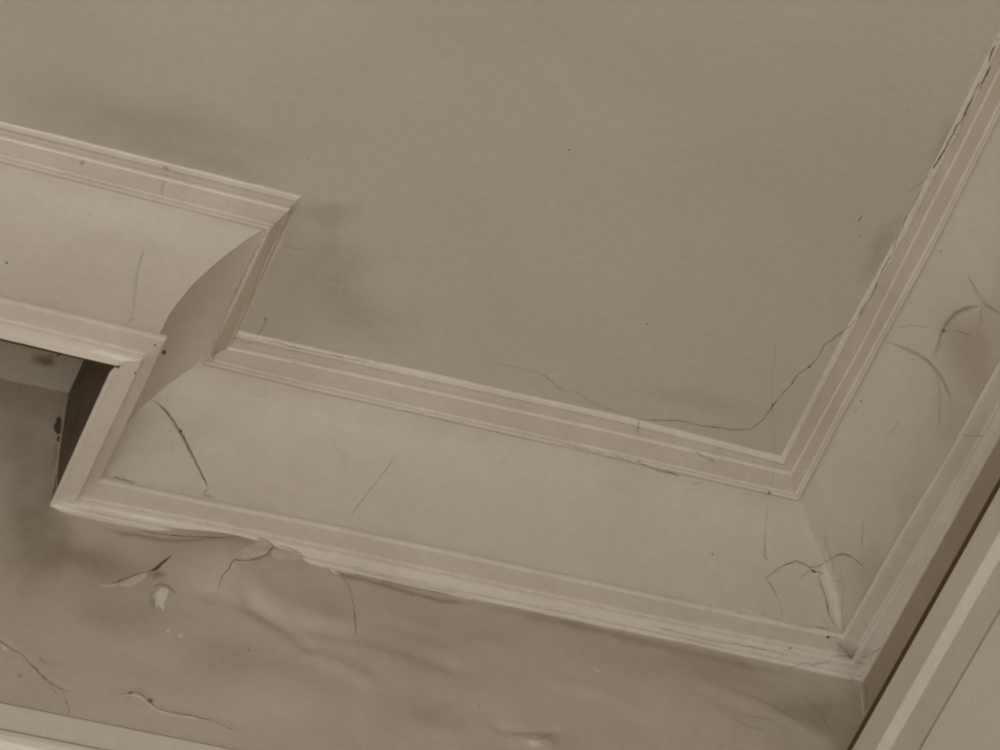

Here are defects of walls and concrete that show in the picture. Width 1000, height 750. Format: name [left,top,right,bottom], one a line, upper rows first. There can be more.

spalling [100,555,171,587]
peeling [153,588,169,611]